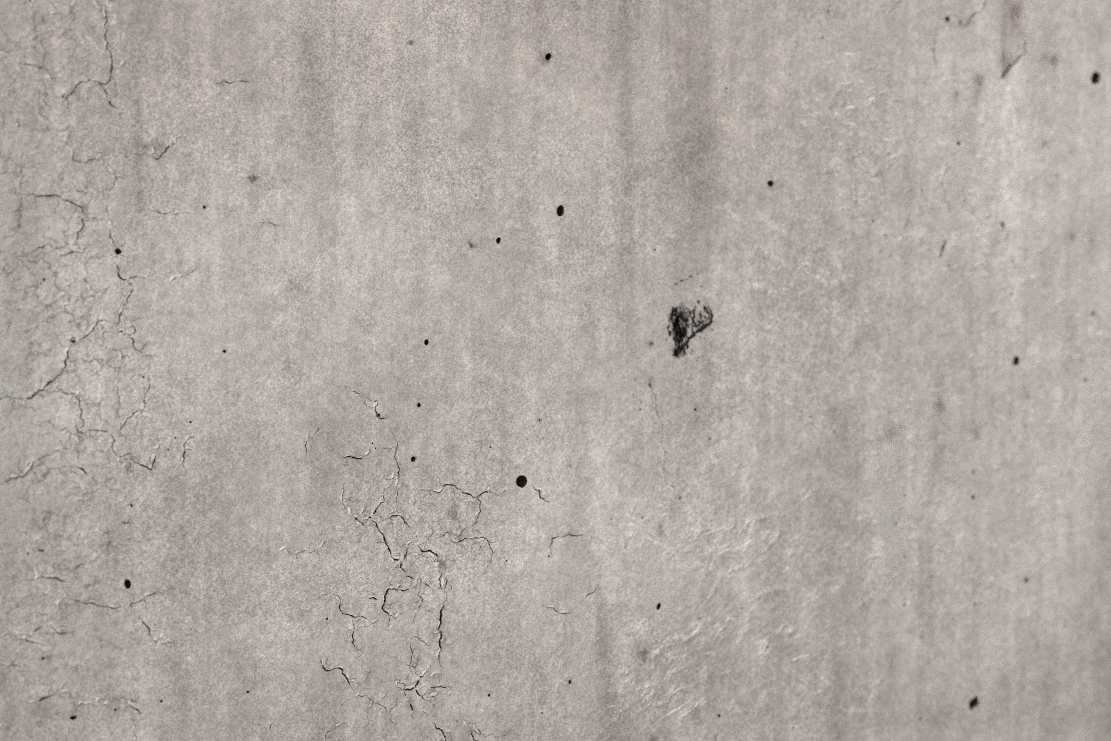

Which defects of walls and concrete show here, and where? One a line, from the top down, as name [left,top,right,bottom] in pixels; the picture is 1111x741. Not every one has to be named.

crack [0,0,197,485]
crack [0,511,175,669]
crack [278,385,549,741]
crack [548,525,583,555]
crack [29,682,148,741]